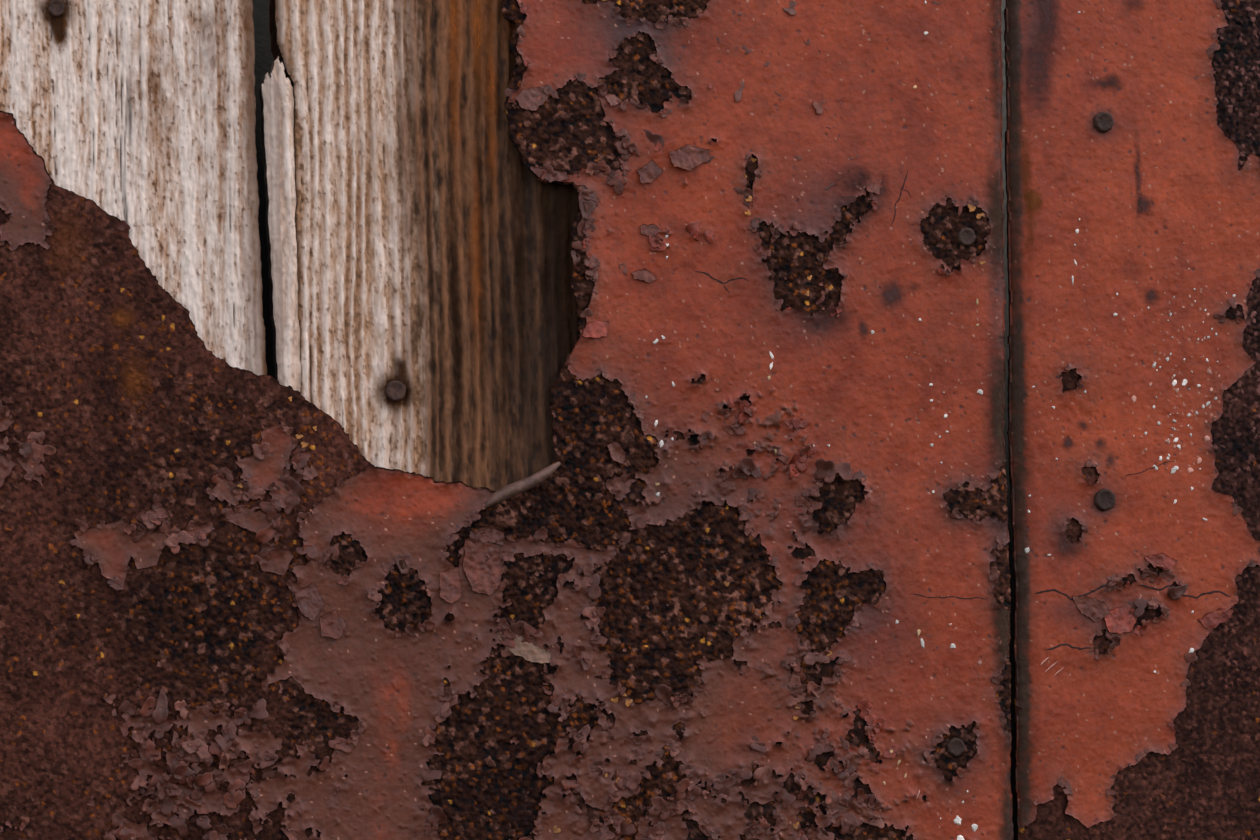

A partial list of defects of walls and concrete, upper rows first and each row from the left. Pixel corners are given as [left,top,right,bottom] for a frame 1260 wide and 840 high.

corrosion [1206,0,1260,170]
corrosion [474,0,709,336]
corrosion [733,153,880,318]
corrosion [0,178,436,840]
peeling [206,426,339,565]
peeling [426,525,515,603]
peeling [489,617,551,663]
corrosion [421,354,886,840]
peeling [778,443,853,517]
corrosion [987,268,1260,840]
peeling [1072,553,1188,640]
peeling [547,692,898,840]